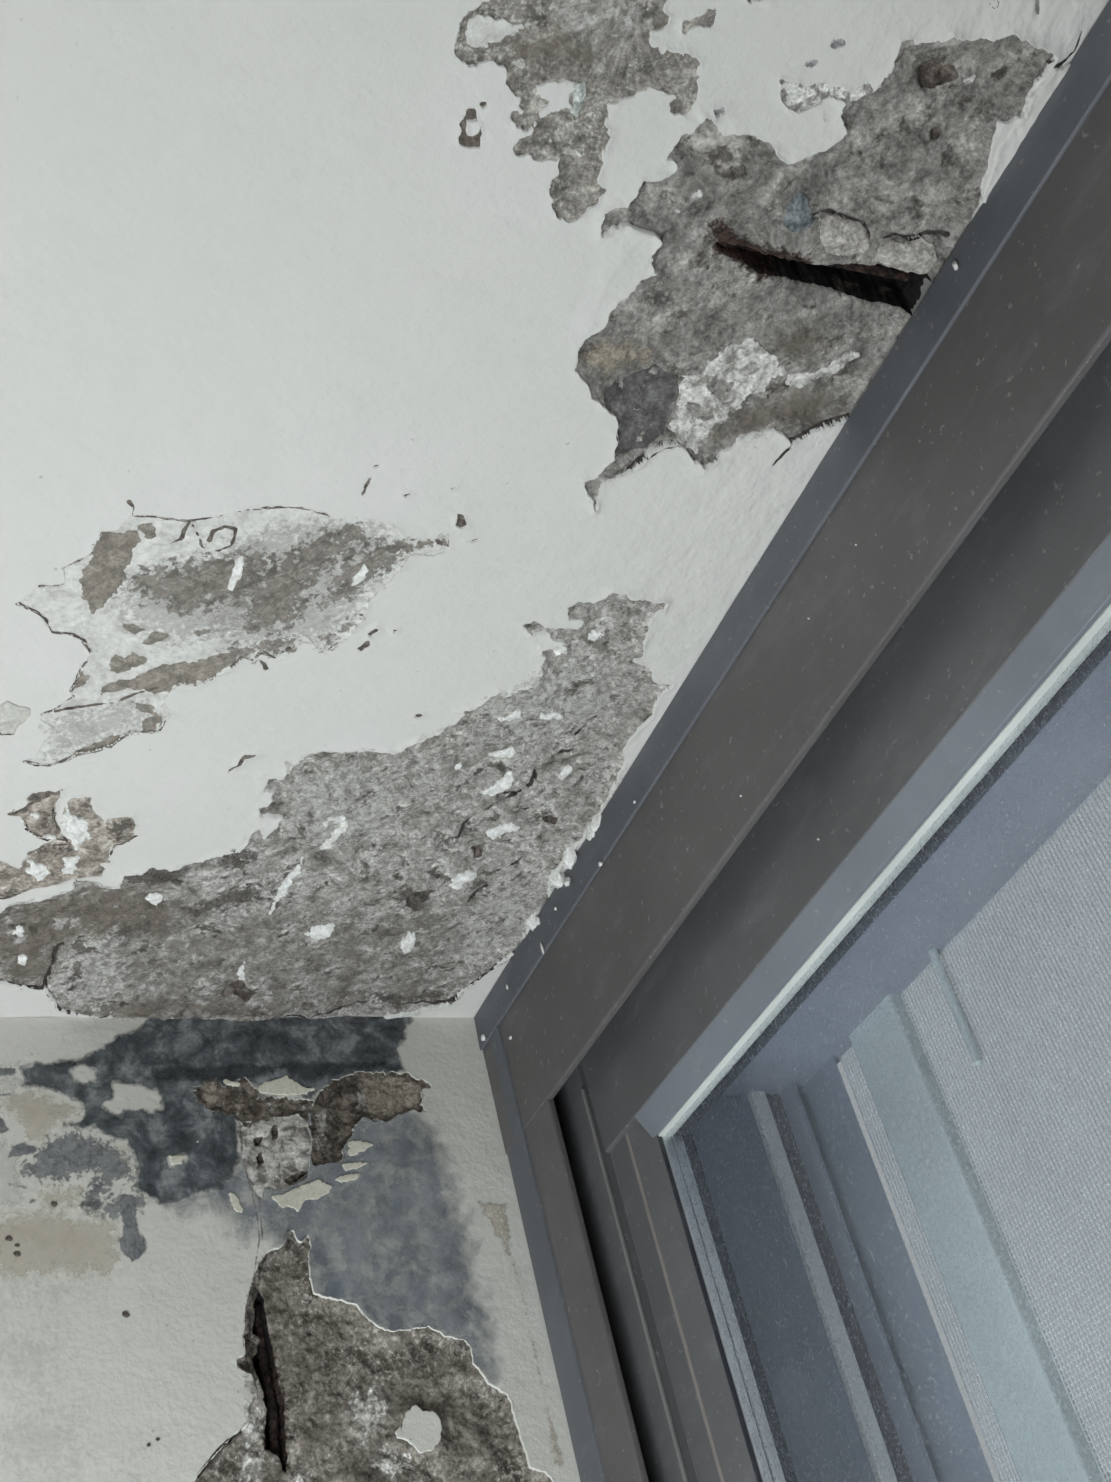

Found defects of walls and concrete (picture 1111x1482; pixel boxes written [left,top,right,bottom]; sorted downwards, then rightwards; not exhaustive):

flaking render [454,0,1082,506]
peeling [0,500,476,767]
flaking render [0,593,670,1022]
flaking render [169,1155,185,1165]
water stain [0,1017,489,1370]
flaking render [193,1070,552,1482]
water stain [478,1201,511,1256]